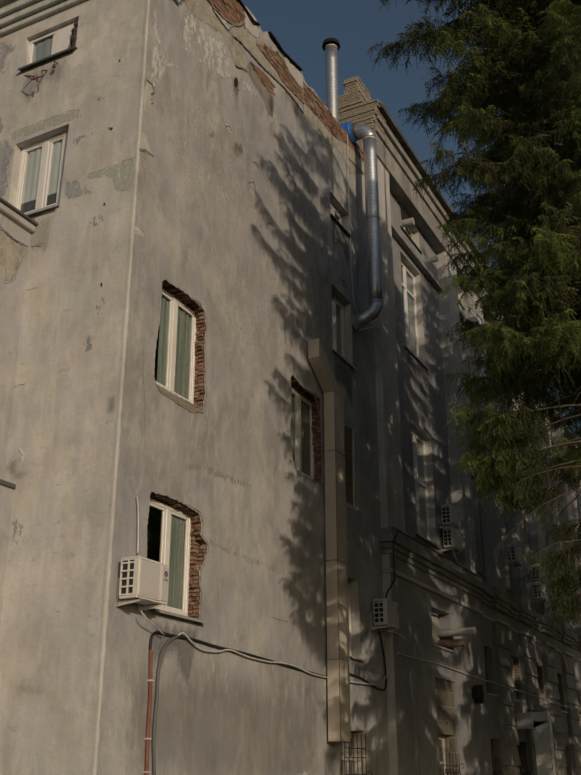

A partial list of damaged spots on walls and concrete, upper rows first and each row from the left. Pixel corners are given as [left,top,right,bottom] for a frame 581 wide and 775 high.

flaking render [182,0,364,175]
peeling [0,107,81,196]
peeling [67,132,154,198]
flaking render [0,225,29,284]
spalling [154,279,207,411]
spalling [290,374,324,486]
spalling [145,491,212,623]